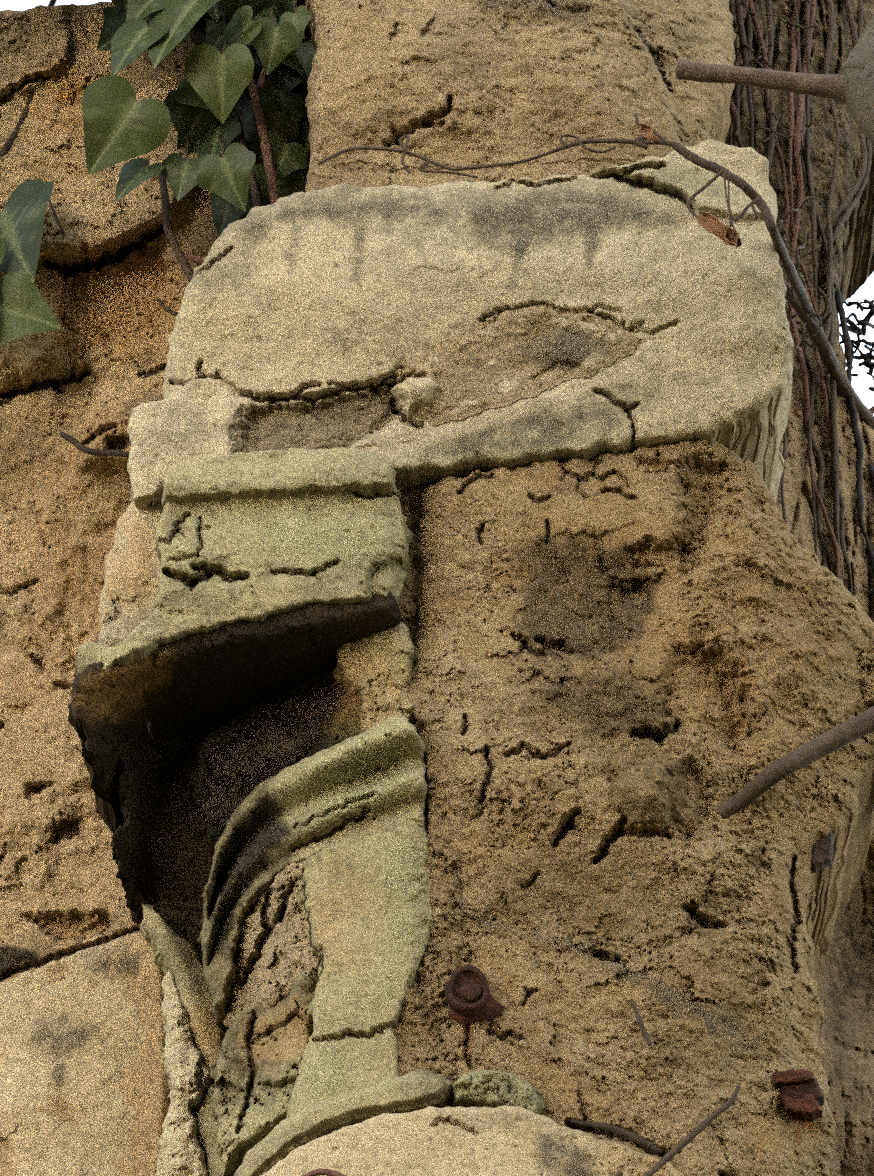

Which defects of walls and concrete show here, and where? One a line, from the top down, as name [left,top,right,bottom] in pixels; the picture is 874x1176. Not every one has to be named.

crack [480,304,674,334]
crack [158,515,338,590]